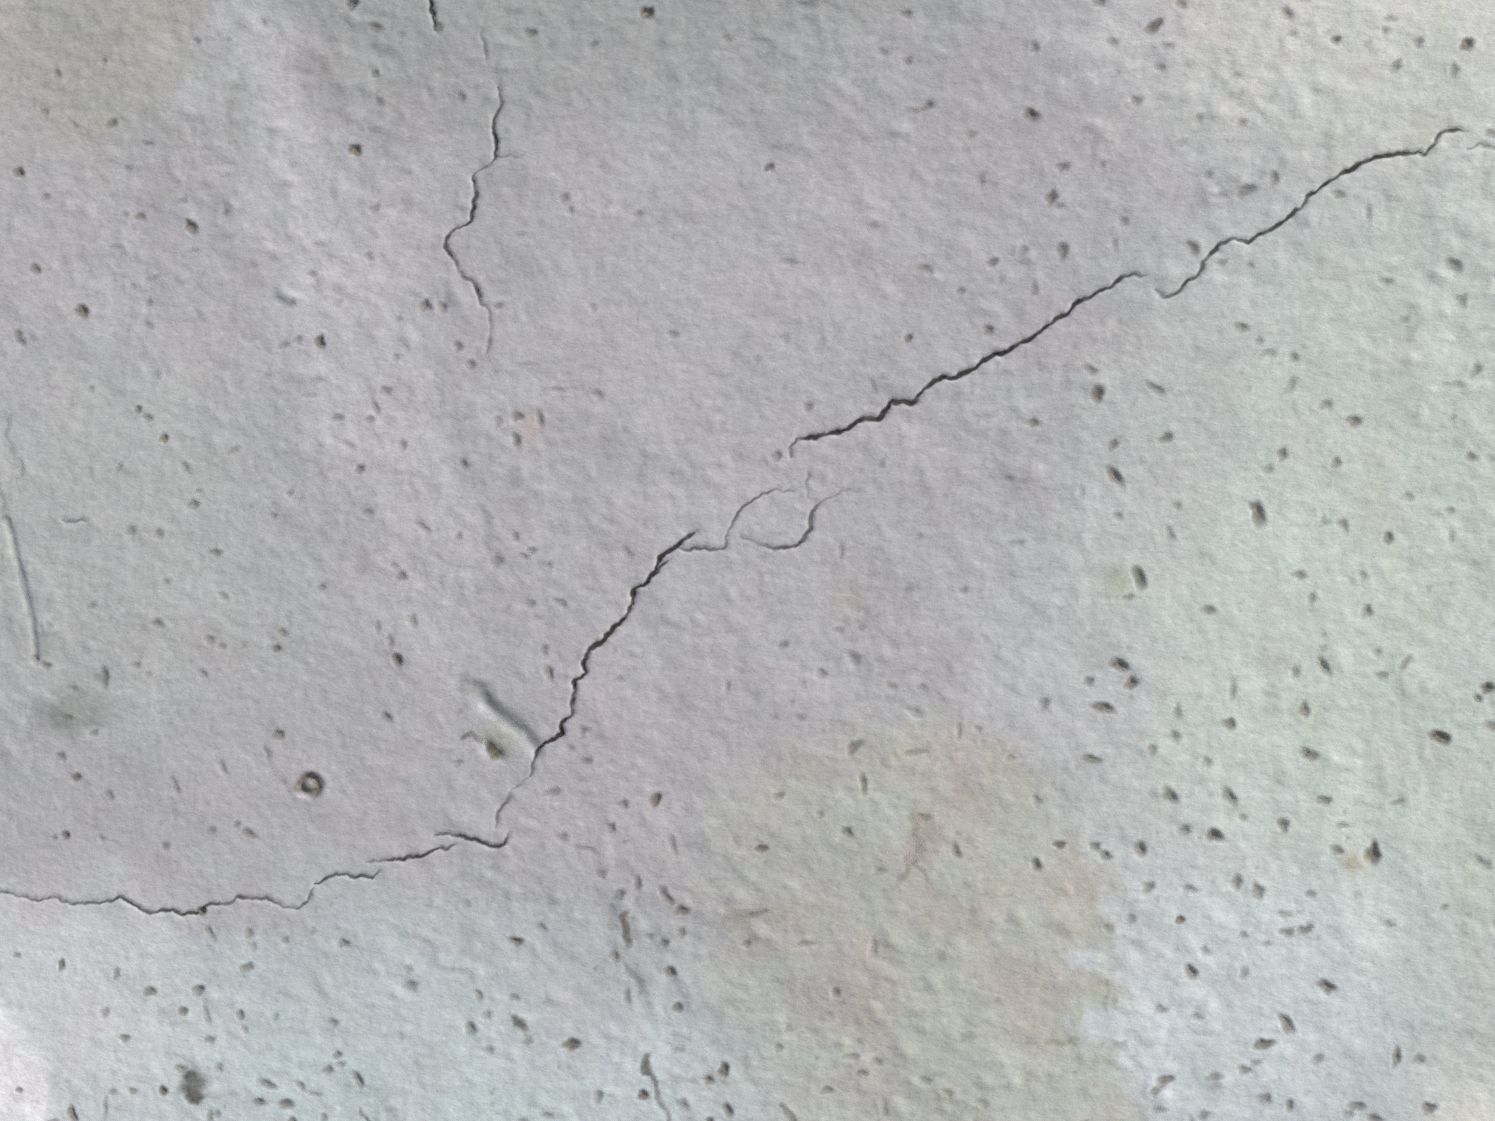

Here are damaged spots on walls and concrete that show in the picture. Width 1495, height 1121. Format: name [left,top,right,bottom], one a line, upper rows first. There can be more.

crack [429,0,437,28]
crack [444,86,502,301]
crack [795,129,1462,443]
crack [532,495,761,768]
crack [766,509,815,549]
crack [4,815,508,916]